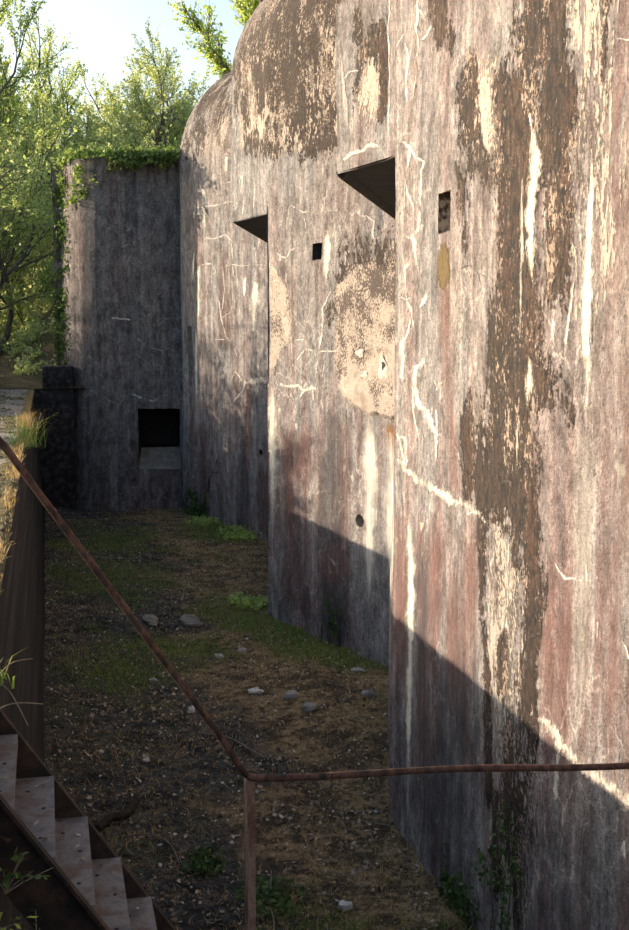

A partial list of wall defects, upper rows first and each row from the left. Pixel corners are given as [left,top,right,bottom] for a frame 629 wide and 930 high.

damp [179,0,390,172]
damp [192,252,200,319]
damp [237,278,260,340]
damp [323,224,396,341]
crack [344,0,483,521]
damp [268,392,284,526]
damp [363,429,394,604]
damp [428,0,593,930]
damp [405,519,428,797]